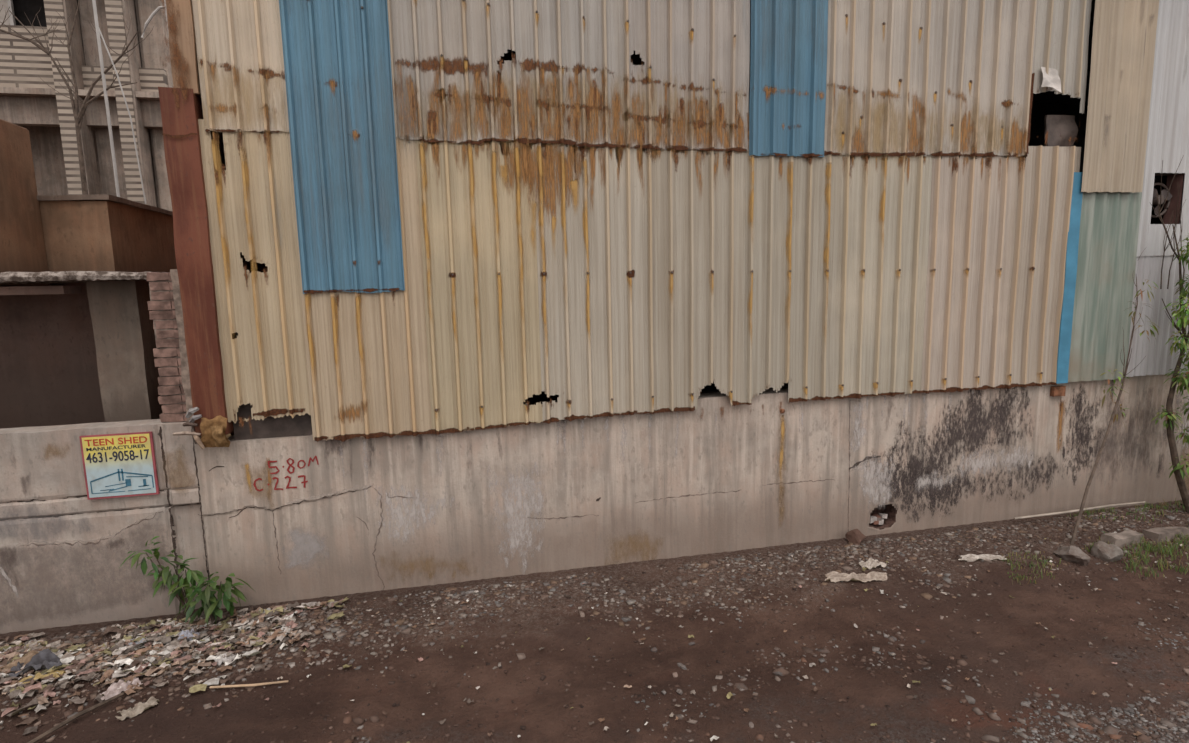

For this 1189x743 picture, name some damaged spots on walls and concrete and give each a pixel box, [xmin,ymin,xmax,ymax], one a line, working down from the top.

rust [393,54,1035,333]
rust [234,408,305,430]
leakage [861,387,1150,522]
crack [198,485,412,587]
spalling [867,503,899,531]